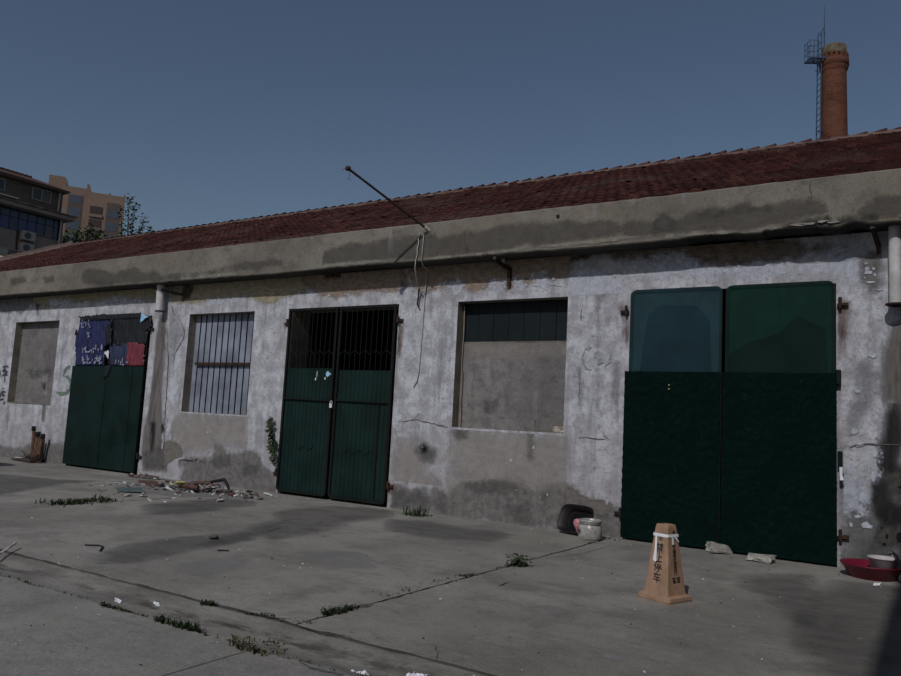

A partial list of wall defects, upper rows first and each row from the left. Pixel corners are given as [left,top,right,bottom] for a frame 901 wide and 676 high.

damp [323,200,825,268]
damp [569,249,864,301]
damp [873,324,901,527]
peeling [390,443,621,538]